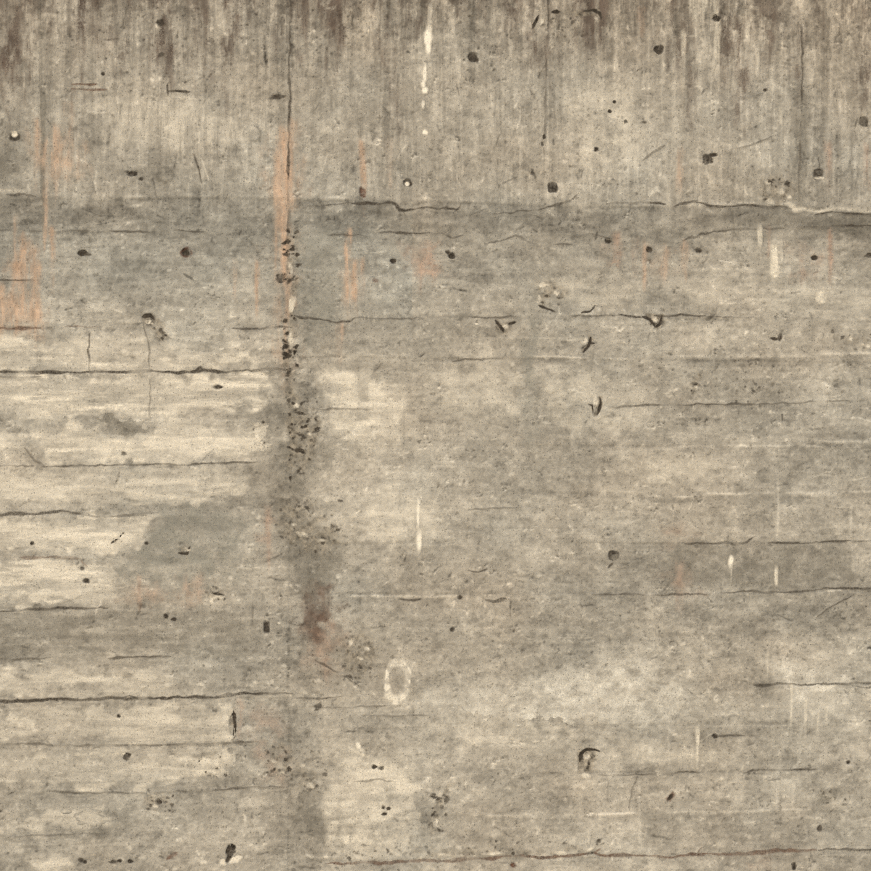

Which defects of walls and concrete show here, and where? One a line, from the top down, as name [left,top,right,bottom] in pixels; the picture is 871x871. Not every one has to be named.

damp [0,0,871,297]
crack [605,21,871,242]
corrosion [0,98,96,350]
corrosion [253,114,316,397]
damp [295,219,343,362]
crack [0,323,294,422]
damp [261,389,361,603]
crack [0,658,432,718]
corrosion [285,563,353,692]
damp [270,781,336,871]
crack [353,776,397,784]
crack [324,846,871,867]